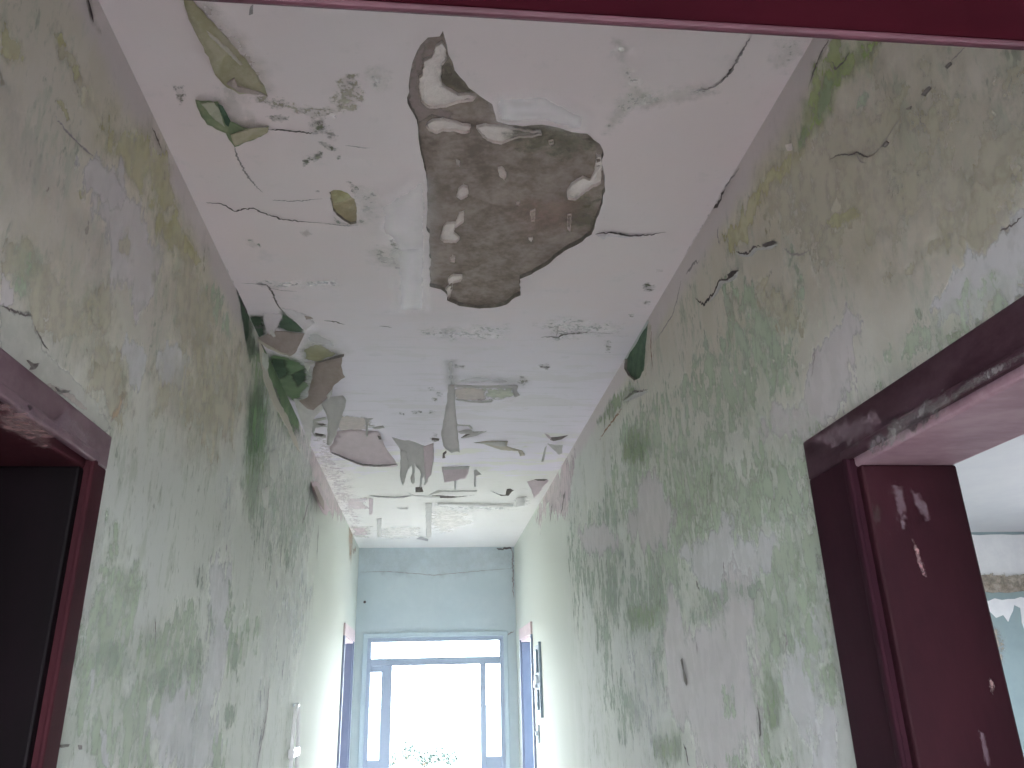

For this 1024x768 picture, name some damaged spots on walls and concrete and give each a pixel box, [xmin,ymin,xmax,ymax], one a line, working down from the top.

peeling [184,0,268,96]
peeling [195,100,269,147]
crack [210,147,358,226]
mould [257,75,364,164]
spalling [407,32,605,309]
crack [597,232,663,240]
crack [694,38,750,92]
crack [657,169,810,338]
mould [108,128,334,580]
peeling [258,308,573,541]
leakage [568,268,842,768]
mould [60,512,203,768]